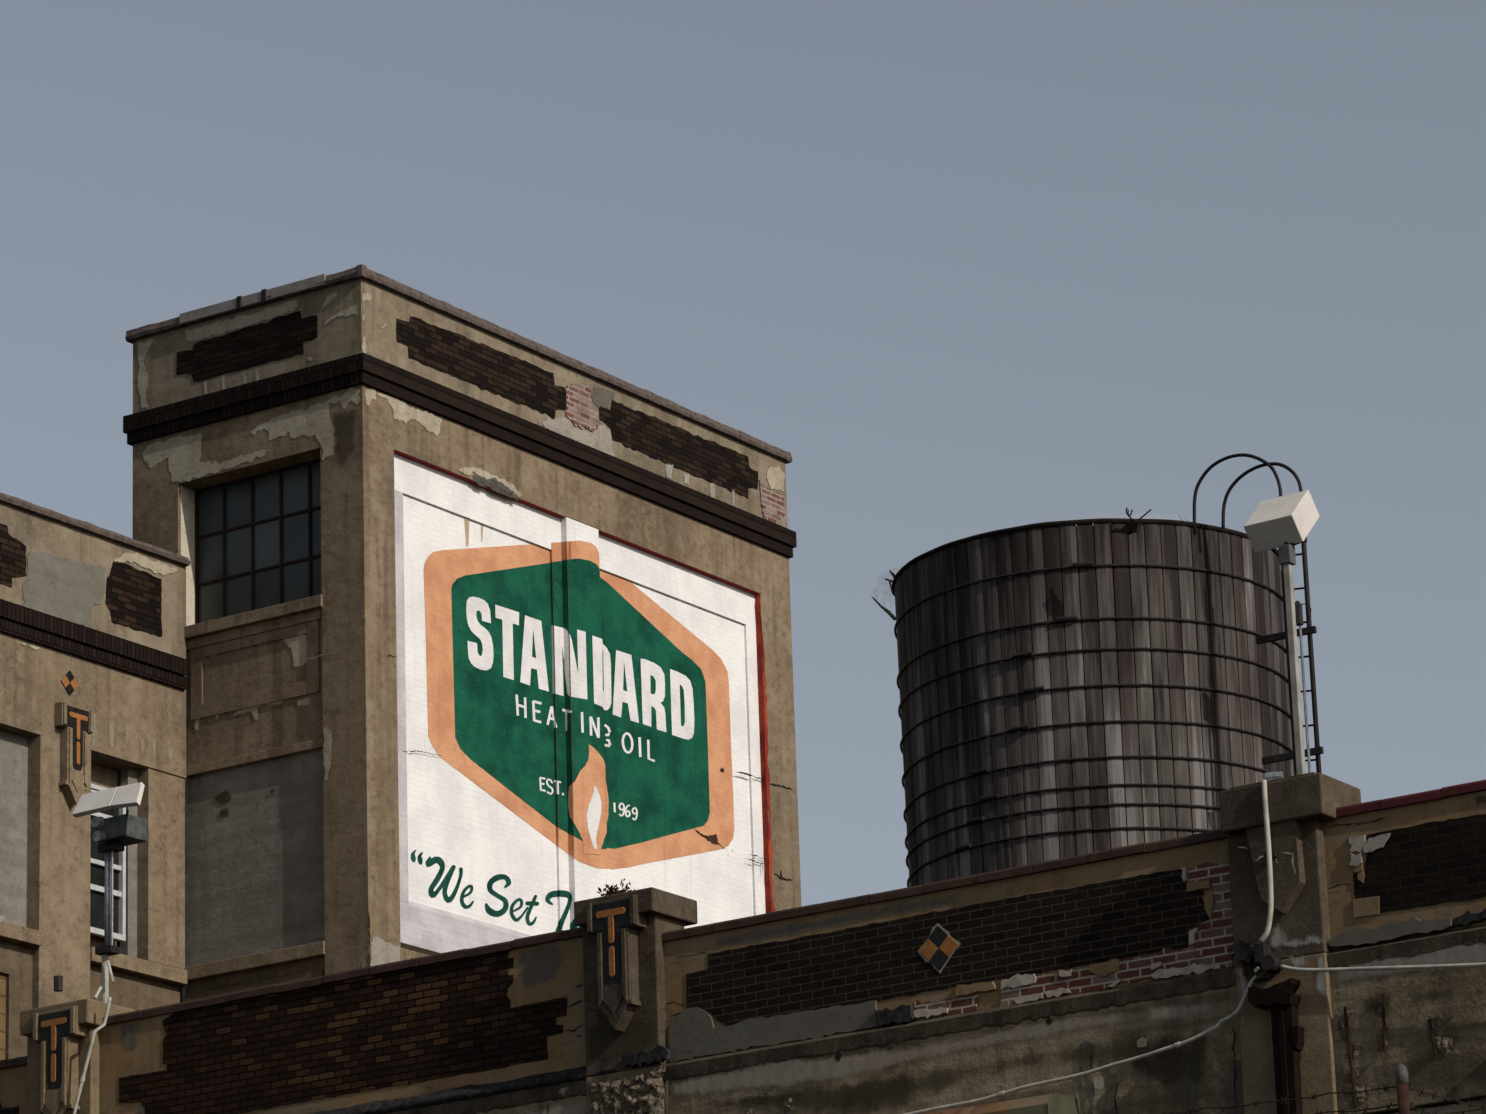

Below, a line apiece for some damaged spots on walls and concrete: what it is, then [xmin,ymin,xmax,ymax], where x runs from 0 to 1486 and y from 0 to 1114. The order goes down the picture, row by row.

flaking render [565,383,601,432]
flaking render [759,466,786,526]
flaking render [1349,833,1391,918]
flaking render [913,862,1234,1019]